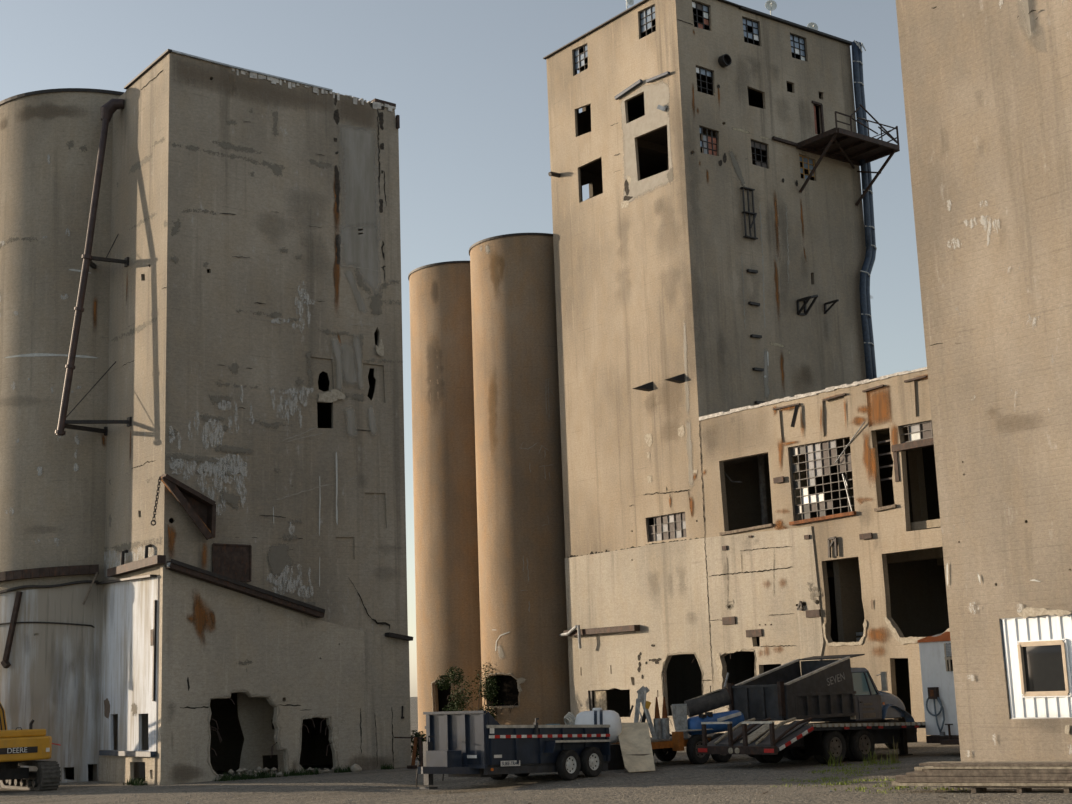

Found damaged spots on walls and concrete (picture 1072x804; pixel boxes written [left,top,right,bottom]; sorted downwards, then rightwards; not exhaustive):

corrosion [773,406,804,467]
corrosion [820,386,897,481]
spalling [167,445,252,509]
corrosion [187,596,215,642]
crack [350,580,390,630]
spalling [207,689,345,777]